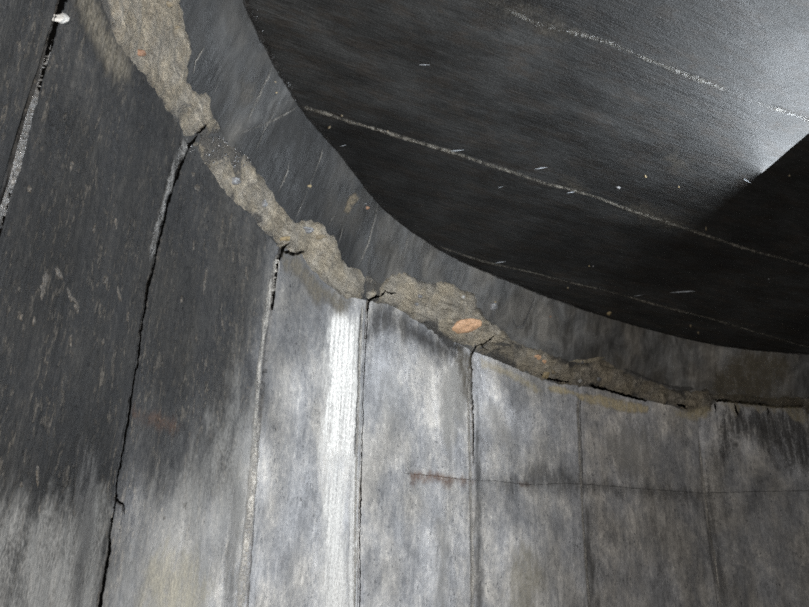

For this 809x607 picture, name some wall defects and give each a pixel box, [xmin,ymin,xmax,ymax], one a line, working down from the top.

crack [98,123,208,607]
crack [352,290,395,607]
crack [409,334,809,496]